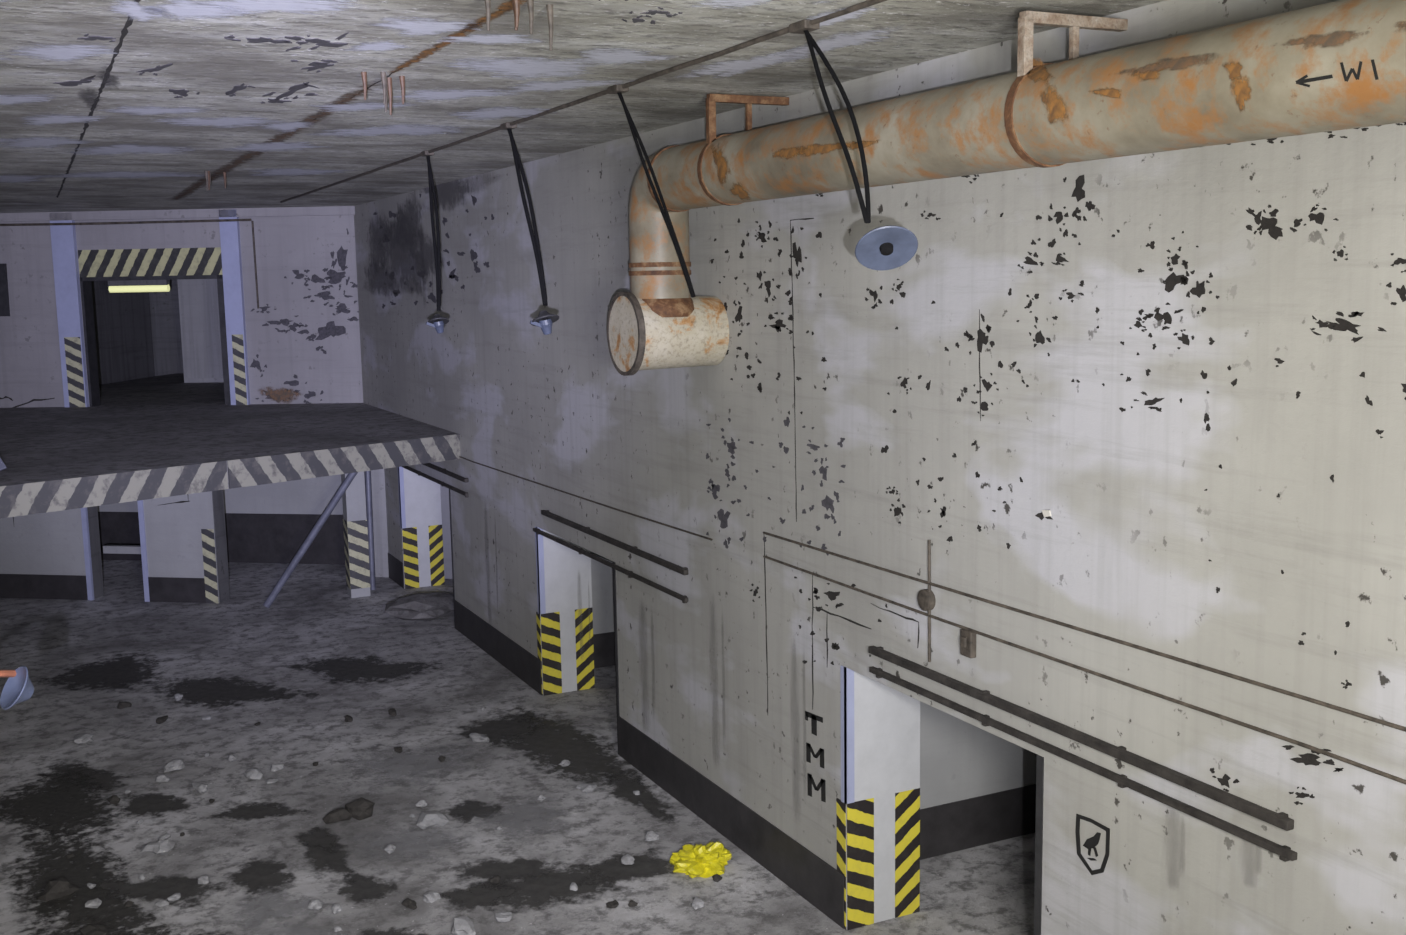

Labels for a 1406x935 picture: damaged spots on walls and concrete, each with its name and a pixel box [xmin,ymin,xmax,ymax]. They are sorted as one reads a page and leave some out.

rust [394,0,527,72]
crack [57,0,140,198]
peeling [1246,204,1338,240]
peeling [251,229,359,354]
peeling [710,218,822,393]
peeling [1310,311,1387,343]
peeling [945,314,1029,416]
water stain [37,762,189,818]
water stain [212,802,307,820]
water stain [448,800,502,823]
water stain [94,858,295,907]
water stain [297,827,398,903]